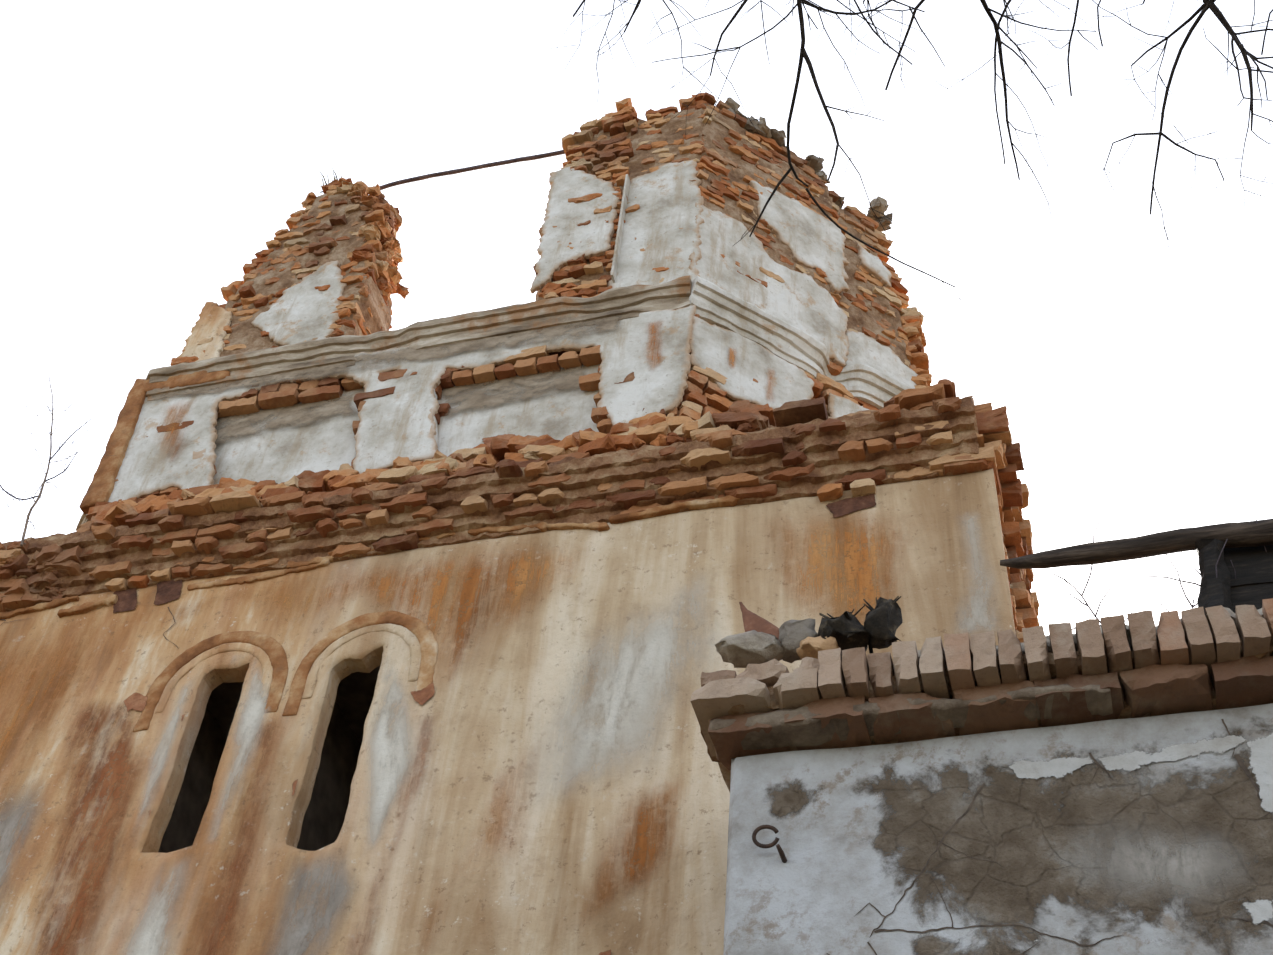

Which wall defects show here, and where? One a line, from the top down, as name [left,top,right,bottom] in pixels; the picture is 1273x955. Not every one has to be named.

rust [796,524,887,614]
crack [1089,752,1113,780]
crack [1221,719,1273,820]
rust [41,708,135,955]
rust [600,796,666,899]
crack [856,783,1123,955]
spalling [854,724,1273,955]
crack [1223,916,1273,927]